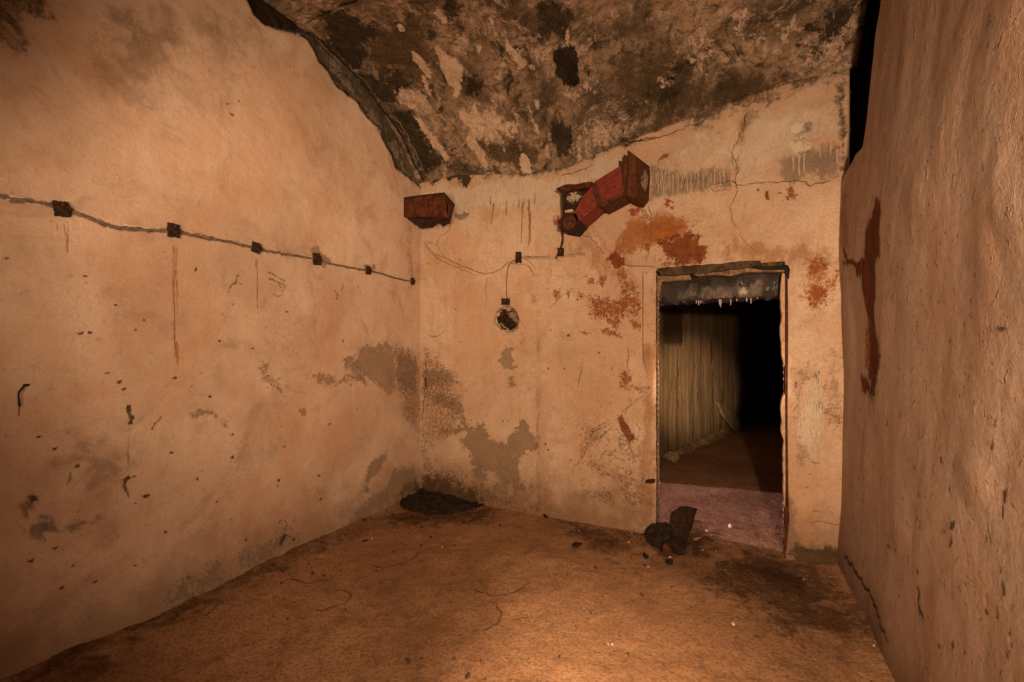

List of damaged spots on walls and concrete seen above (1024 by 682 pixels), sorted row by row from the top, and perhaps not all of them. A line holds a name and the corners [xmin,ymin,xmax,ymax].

water stain [314,0,852,244]
crack [626,122,701,146]
crack [712,100,830,252]
rust [553,214,707,339]
rust [800,197,881,400]
peeling [348,453,418,525]
peeling [312,341,549,503]
rust [579,409,639,463]